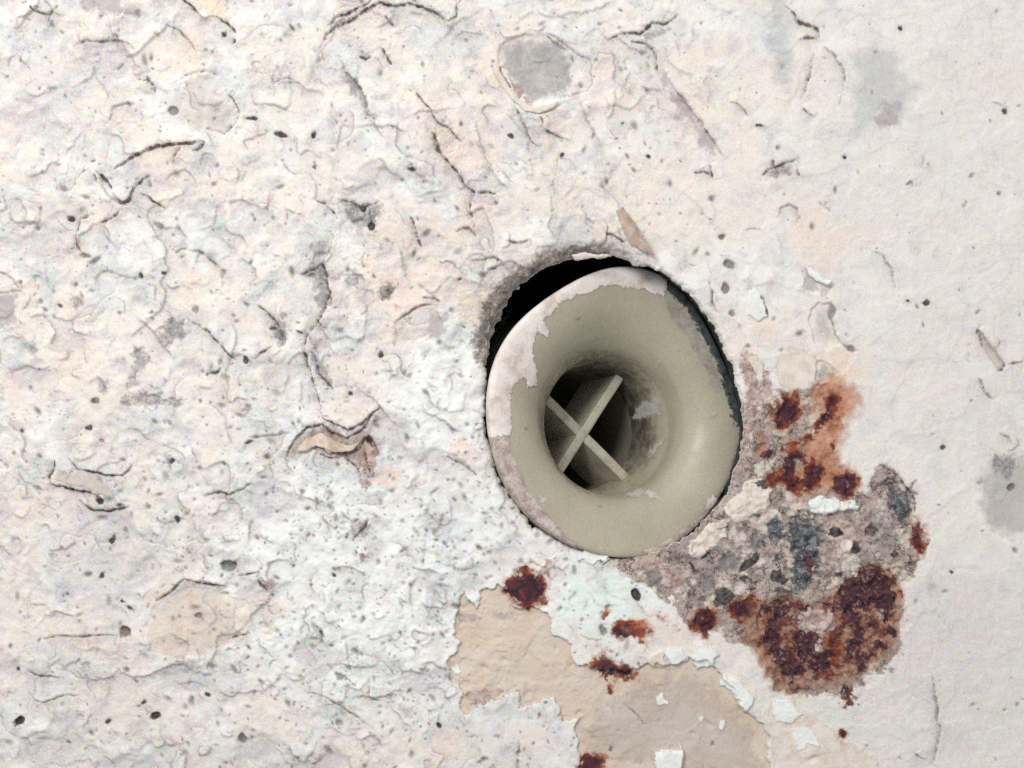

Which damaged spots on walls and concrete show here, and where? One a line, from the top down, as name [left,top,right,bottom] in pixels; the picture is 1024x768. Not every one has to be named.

crack [330,0,457,32]
spalling [503,40,569,106]
crack [76,141,203,248]
crack [259,200,378,472]
crack [48,461,129,512]
peeling [296,433,359,452]
spalling [575,343,930,674]
corrosion [765,377,861,501]
corrosion [502,557,555,610]
corrosion [602,606,653,643]
peeling [446,584,878,768]
corrosion [688,562,903,708]